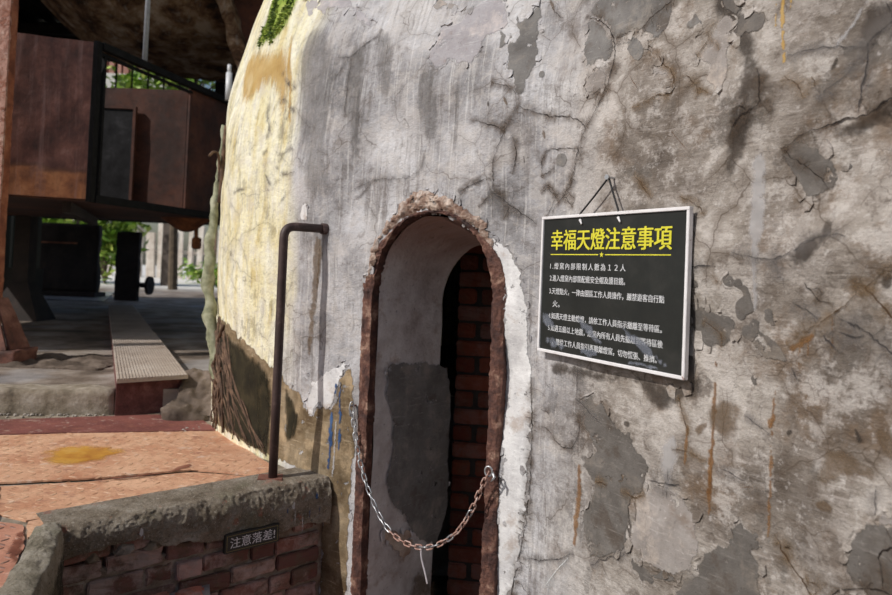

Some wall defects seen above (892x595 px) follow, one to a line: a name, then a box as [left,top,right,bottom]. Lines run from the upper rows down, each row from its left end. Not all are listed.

crack [458,0,709,224]
damp [717,0,766,170]
crack [725,71,768,143]
rust [775,0,792,62]
crack [783,1,892,188]
damp [215,335,270,454]
peeling [211,314,355,595]
damp [286,390,298,439]
peeling [363,187,532,595]
rust [573,465,581,545]
peeling [578,390,767,595]
rust [684,382,738,514]